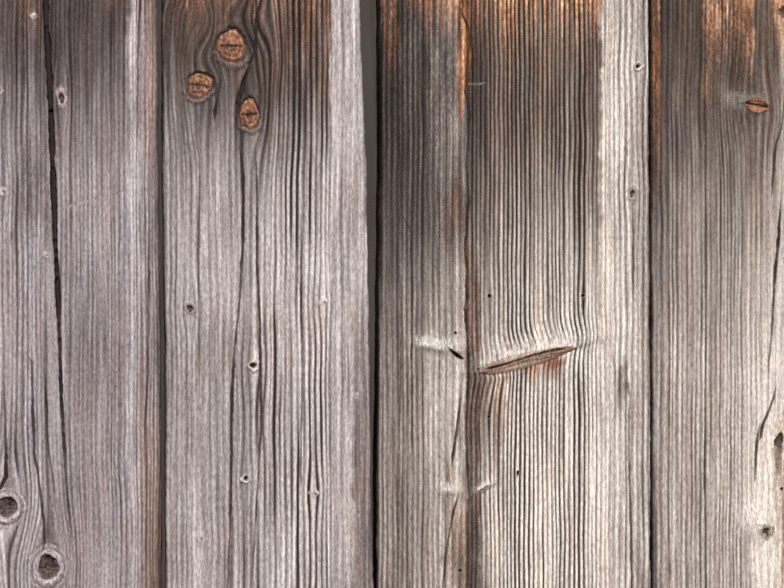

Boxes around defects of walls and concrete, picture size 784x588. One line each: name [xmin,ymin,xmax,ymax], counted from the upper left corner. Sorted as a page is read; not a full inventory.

crack [0,0,70,551]
crack [442,0,565,588]
crack [754,391,775,475]